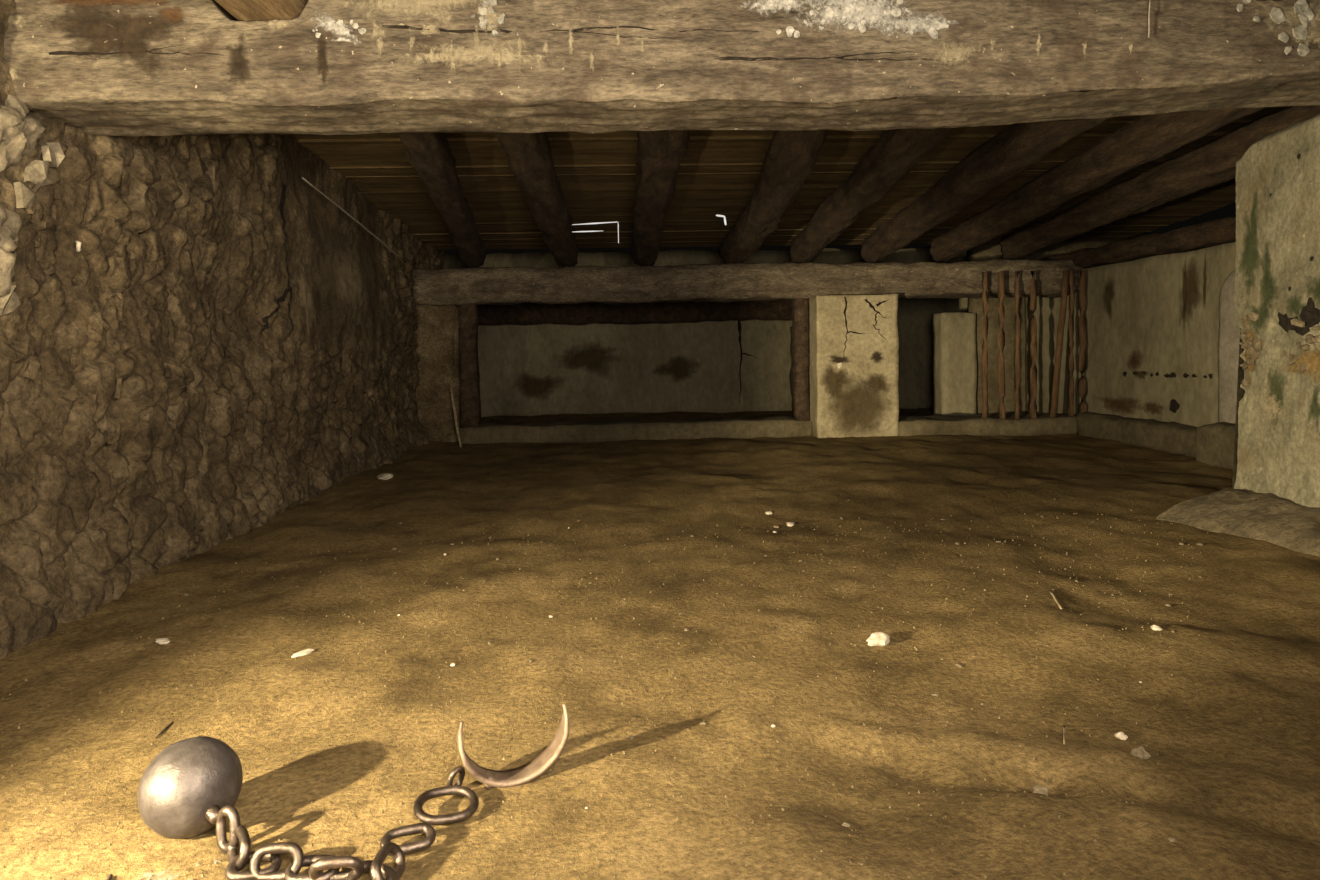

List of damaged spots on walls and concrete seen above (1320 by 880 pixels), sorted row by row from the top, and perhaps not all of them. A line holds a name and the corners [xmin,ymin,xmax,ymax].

leakage [1251,253,1275,327]
spalling [1277,297,1320,384]
leakage [825,369,886,431]
leakage [1259,390,1289,425]
leakage [1310,389,1320,418]